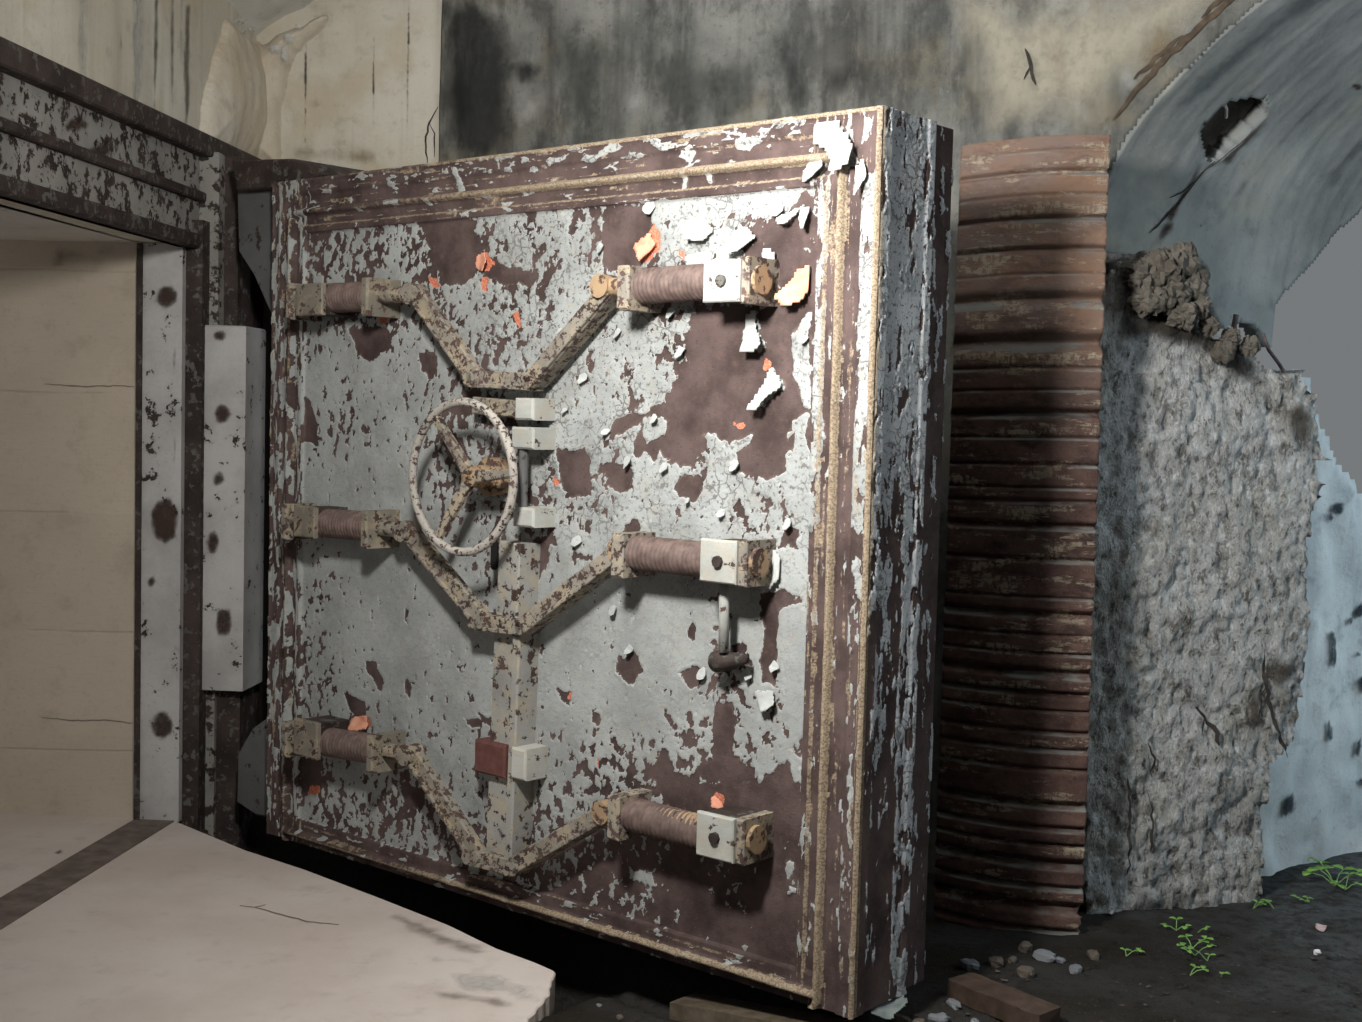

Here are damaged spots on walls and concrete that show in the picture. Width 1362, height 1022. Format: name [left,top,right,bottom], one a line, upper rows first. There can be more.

leakage [451,6,536,156]
rust [66,120,86,130]
peeling [802,120,867,195]
peeling [681,216,775,265]
rust [158,287,176,306]
peeling [739,265,810,352]
spalling [1120,241,1262,376]
peeling [746,369,781,410]
rust [152,500,177,542]
crack [1195,707,1220,746]
crack [1259,652,1288,758]
crack [1127,743,1156,874]